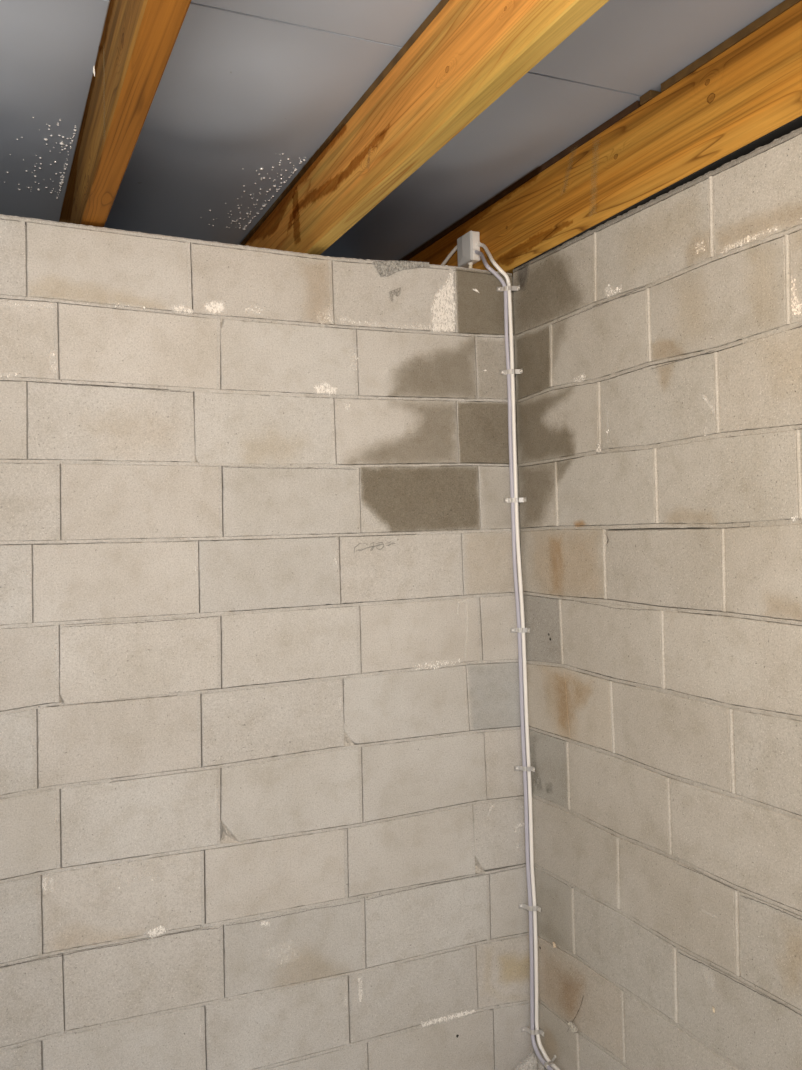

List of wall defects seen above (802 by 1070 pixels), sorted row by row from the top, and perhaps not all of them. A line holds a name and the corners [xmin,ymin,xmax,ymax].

water stain [172,301,225,314]
water stain [317,272,456,332]
water stain [314,382,338,395]